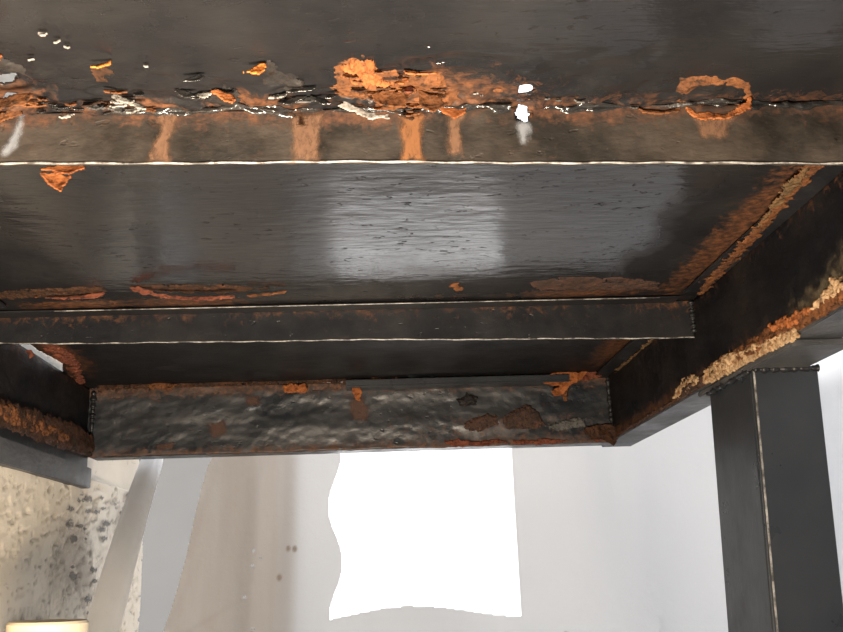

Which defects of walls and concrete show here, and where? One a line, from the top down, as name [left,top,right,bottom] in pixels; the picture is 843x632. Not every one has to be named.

rust [329,55,466,160]
rust [638,75,752,138]
rust [40,165,85,192]
rust [584,256,843,446]
rust [0,399,95,455]
rust [444,438,570,448]